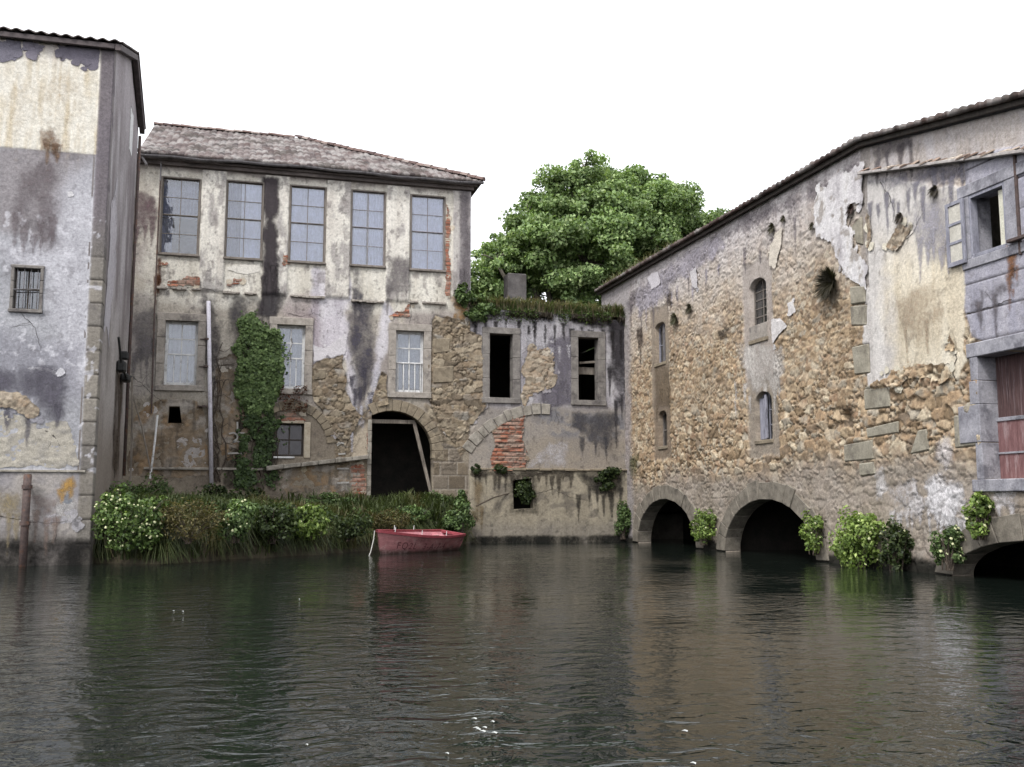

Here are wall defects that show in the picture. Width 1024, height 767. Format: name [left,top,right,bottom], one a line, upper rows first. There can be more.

peeling [0,38,100,71]
flaking render [167,276,200,291]
flaking render [445,204,455,298]
rust [1007,246,1018,294]
spalling [0,391,79,473]
spalling [312,354,389,446]
water stain [350,288,378,418]
spalling [427,316,488,443]
spalling [489,343,560,472]
water stain [472,238,724,455]
spalling [865,334,957,393]